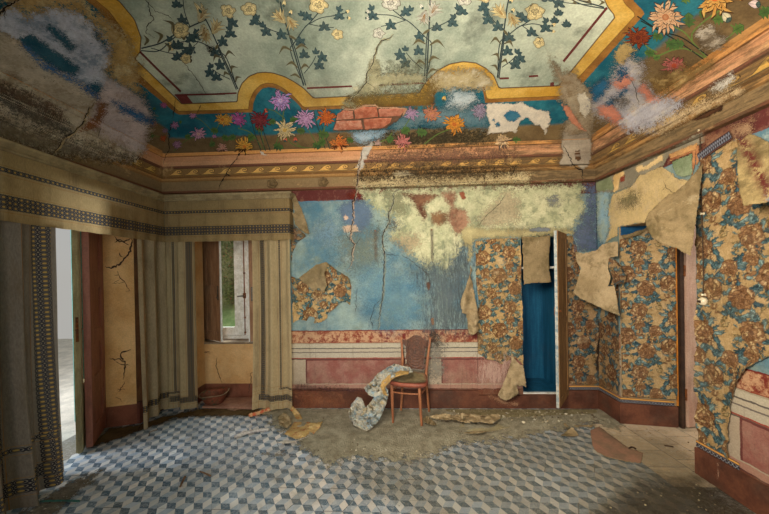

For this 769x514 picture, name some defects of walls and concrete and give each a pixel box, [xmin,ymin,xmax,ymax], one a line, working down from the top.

crack [0,0,21,17]
crack [350,34,394,100]
crack [54,103,101,154]
peeling [333,23,756,276]
crack [345,153,362,269]
crack [355,189,430,330]
water stain [336,124,534,384]